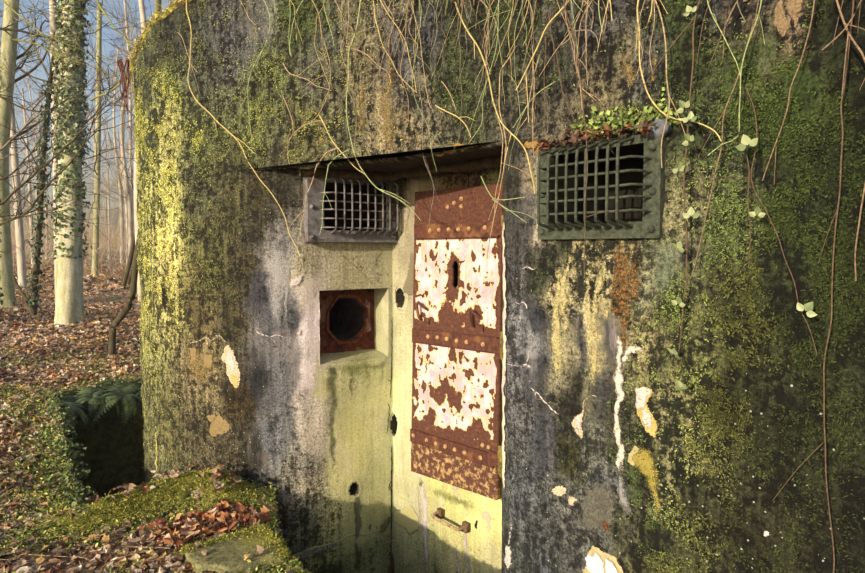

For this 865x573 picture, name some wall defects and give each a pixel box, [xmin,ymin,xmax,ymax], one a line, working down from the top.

peeling [773,0,803,37]
damp [271,251,289,315]
corrosion [610,247,640,347]
peeling [187,345,240,388]
spalling [206,412,230,437]
spalling [572,395,595,438]
damp [614,337,643,467]
spalling [635,386,658,437]